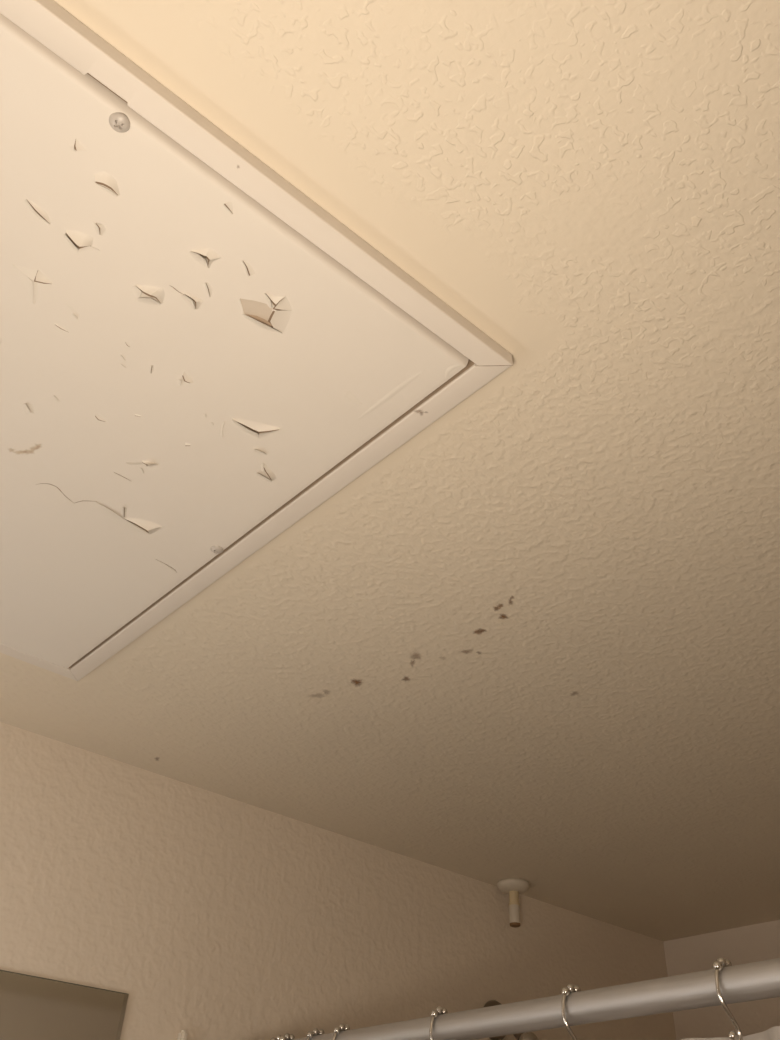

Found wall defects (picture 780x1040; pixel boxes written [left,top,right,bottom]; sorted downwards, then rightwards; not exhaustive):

peeling [94,171,120,197]
peeling [24,199,51,225]
peeling [63,222,106,253]
peeling [189,248,221,269]
peeling [132,283,212,310]
peeling [238,292,292,334]
peeling [232,418,281,482]
peeling [94,502,165,535]